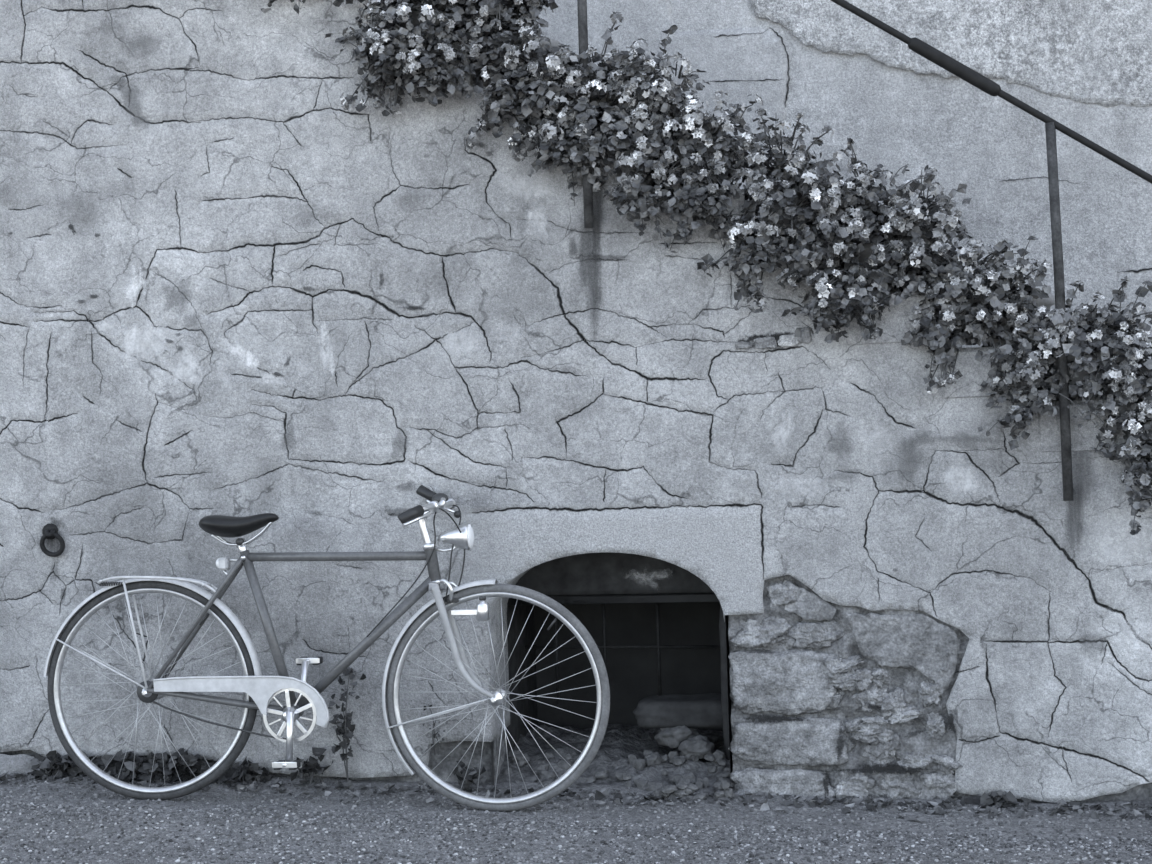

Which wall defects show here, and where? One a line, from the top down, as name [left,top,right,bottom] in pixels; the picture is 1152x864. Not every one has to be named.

crack [0,0,914,615]
crack [115,618,148,668]
crack [302,639,363,657]
crack [834,432,1152,784]